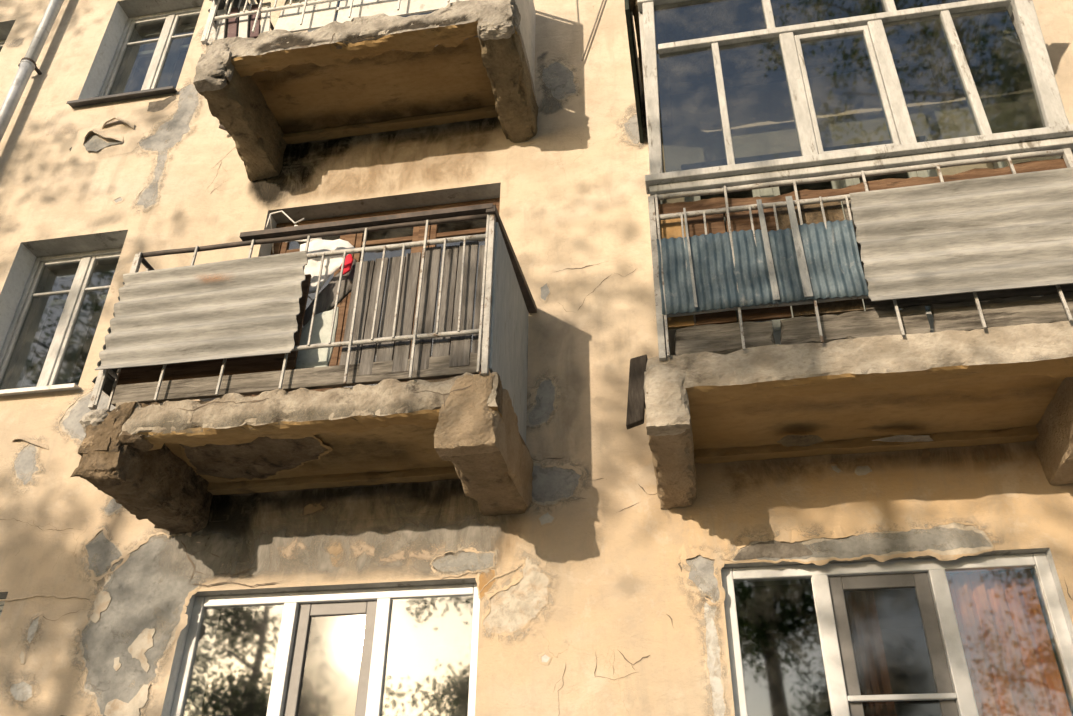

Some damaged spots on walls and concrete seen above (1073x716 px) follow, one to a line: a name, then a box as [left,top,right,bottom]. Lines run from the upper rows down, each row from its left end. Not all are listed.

flaking render [69,82,203,213]
leakage [251,109,500,205]
crack [556,261,636,312]
spalling [54,386,153,456]
leakage [164,479,503,580]
flaking render [529,460,588,509]
flaking render [74,488,205,716]
flaking render [430,544,554,641]
crack [594,650,650,680]
flaking render [676,519,998,716]